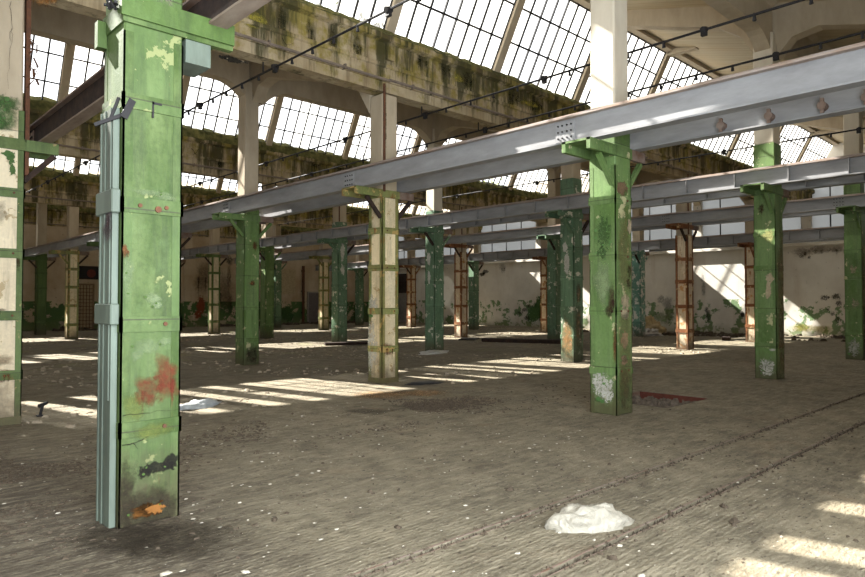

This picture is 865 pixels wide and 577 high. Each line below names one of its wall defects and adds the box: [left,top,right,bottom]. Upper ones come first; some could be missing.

peeling [518,296,540,324]
peeling [821,293,859,323]
peeling [759,349,776,376]
peeling [592,373,614,403]